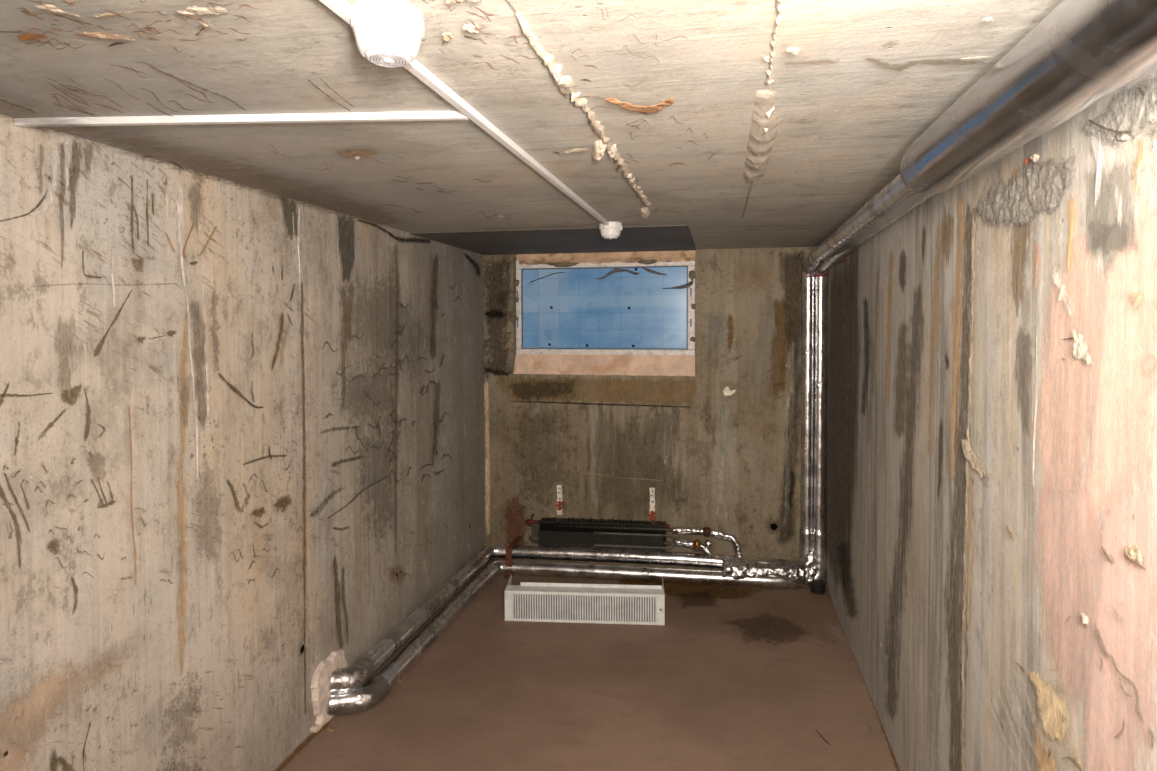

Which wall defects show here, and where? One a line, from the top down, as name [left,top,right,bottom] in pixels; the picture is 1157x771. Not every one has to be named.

peeling [34,0,135,47]
peeling [166,6,230,35]
peeling [442,23,482,44]
crack [557,9,715,188]
damp [483,260,694,404]
corrosion [178,315,189,672]
peeling [1016,214,1157,771]